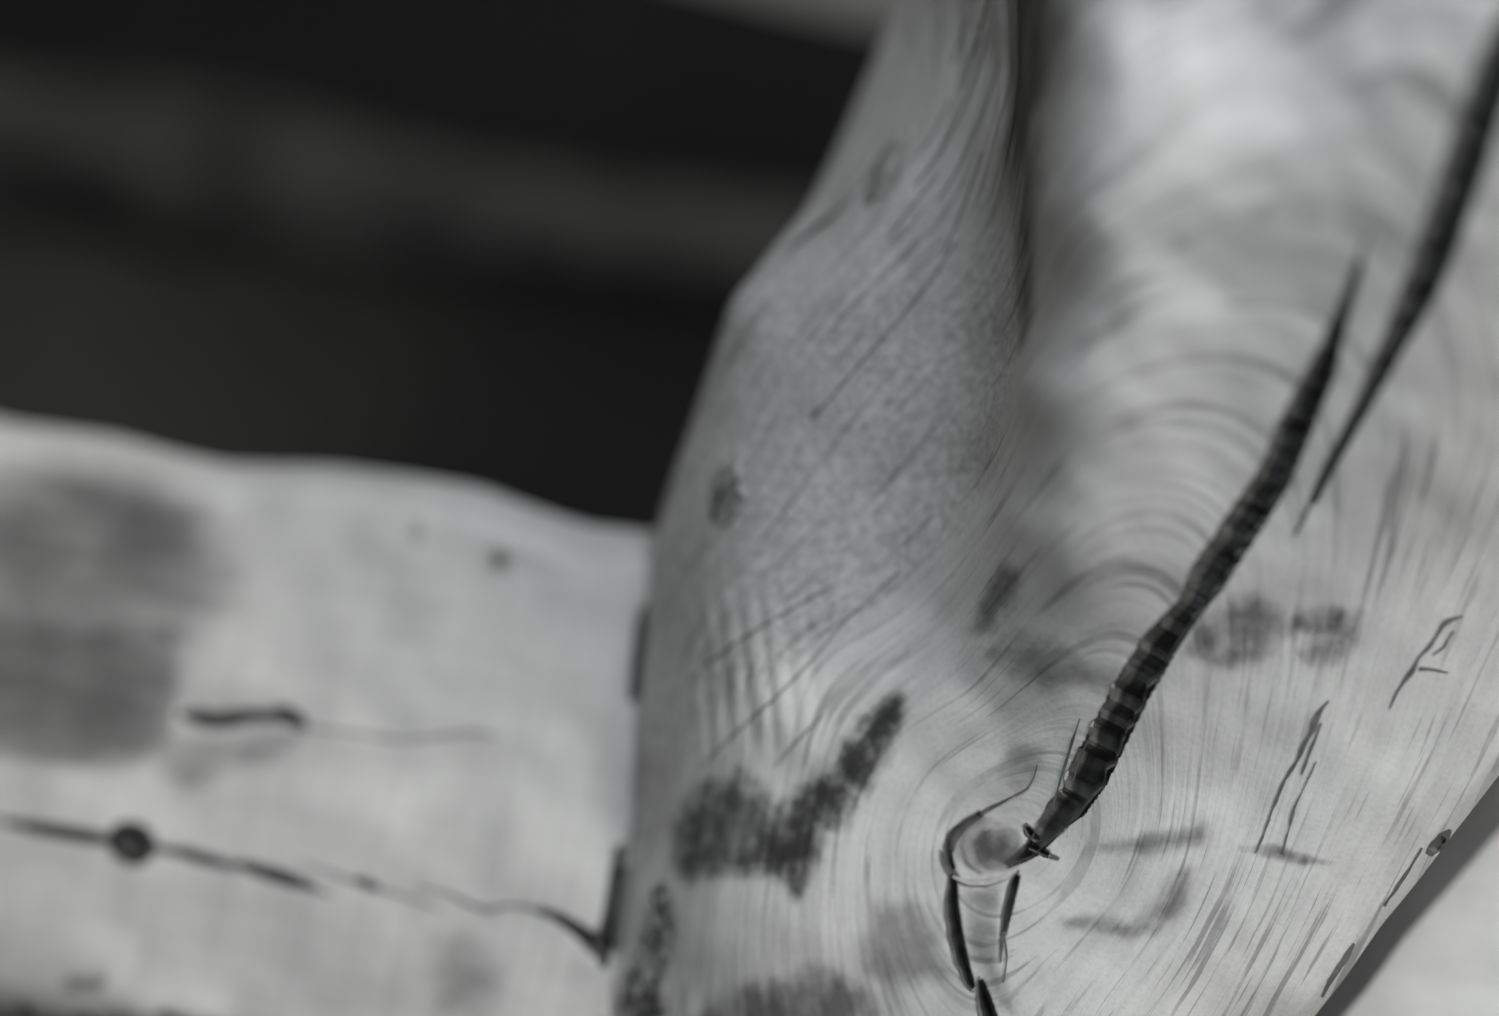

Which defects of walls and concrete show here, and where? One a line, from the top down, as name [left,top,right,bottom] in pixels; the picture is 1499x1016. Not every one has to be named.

crack [940,22,1499,1016]
crack [179,707,496,742]
crack [0,819,109,845]
crack [157,846,604,954]